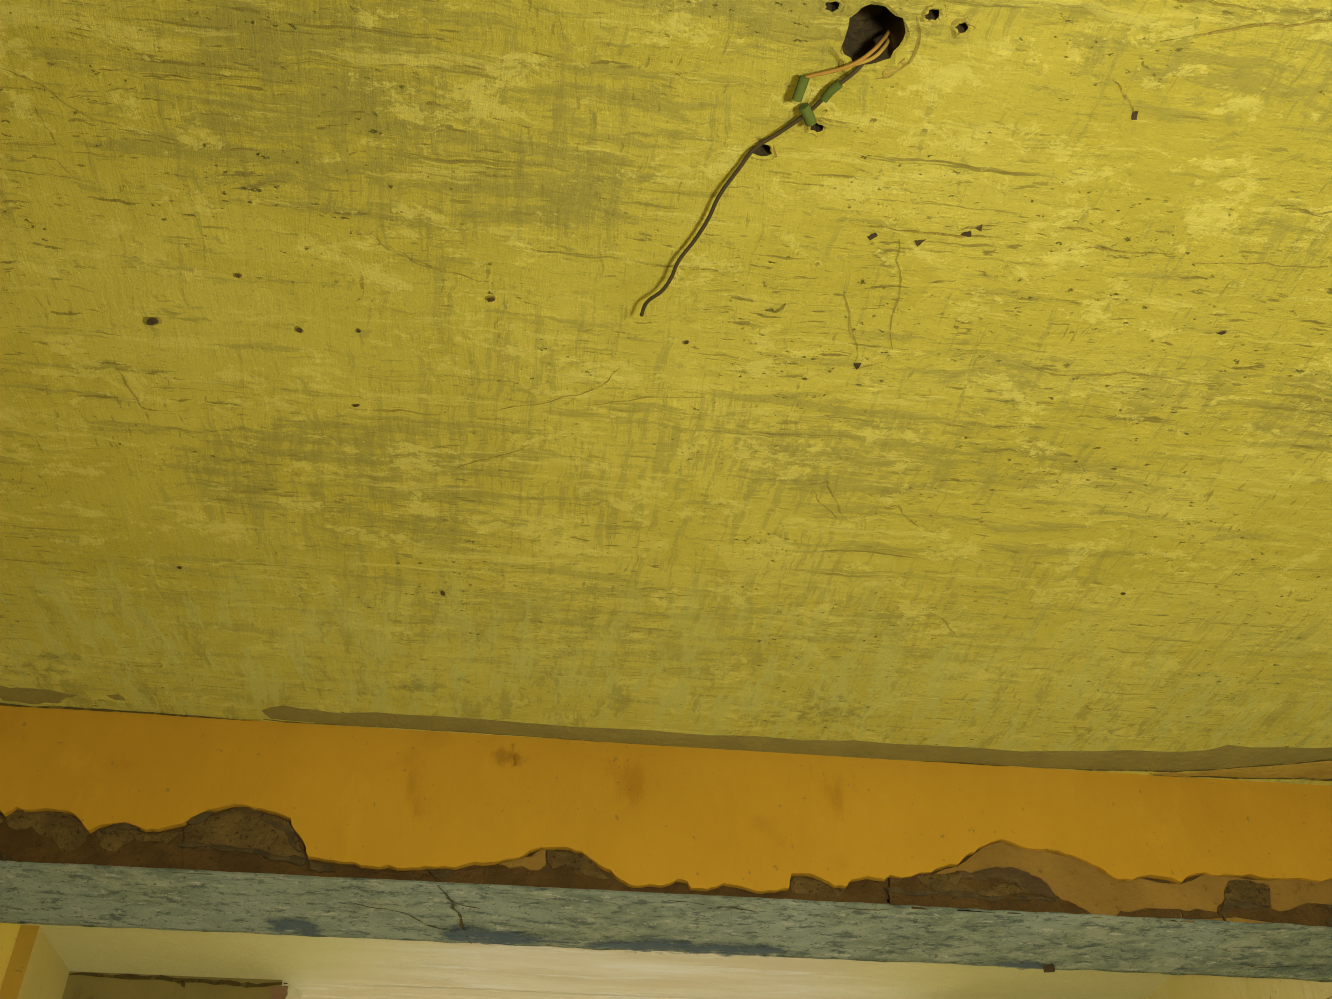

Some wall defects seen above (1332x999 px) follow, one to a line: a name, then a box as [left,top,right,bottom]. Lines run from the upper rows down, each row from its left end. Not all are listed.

crack [1160,0,1332,42]
peeling [262,705,1332,779]
spalling [0,807,1332,927]
peeling [269,986,288,999]